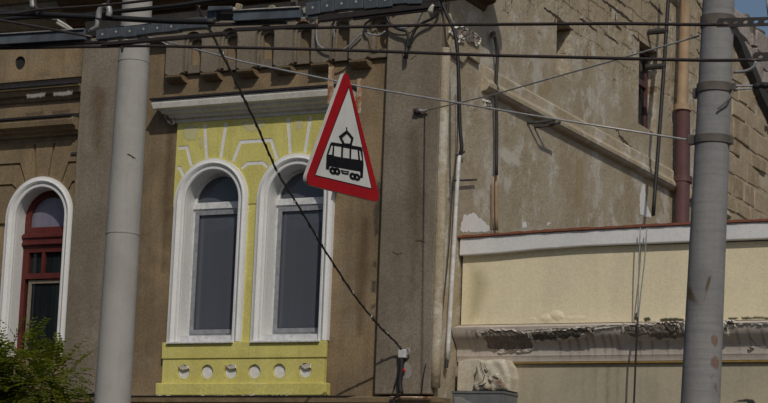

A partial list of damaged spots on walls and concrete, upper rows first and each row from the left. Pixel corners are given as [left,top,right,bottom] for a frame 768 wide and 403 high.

spalling [454,321,685,403]
spalling [723,319,768,336]